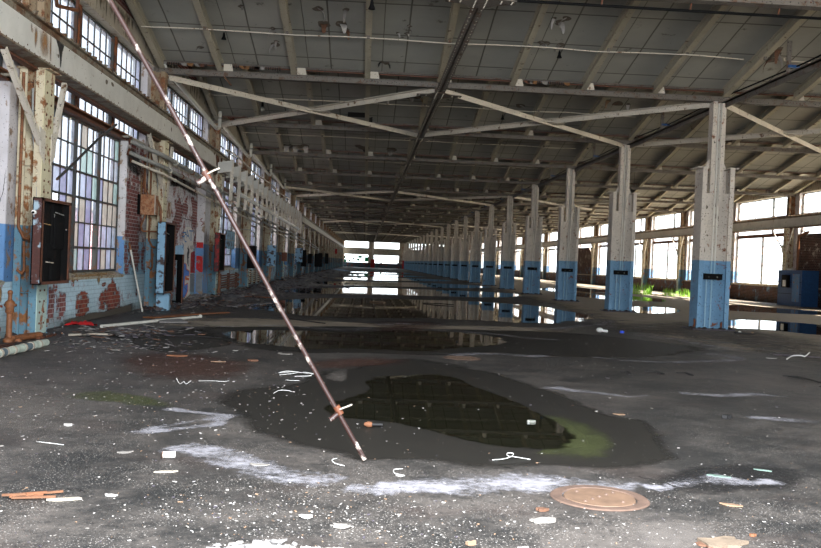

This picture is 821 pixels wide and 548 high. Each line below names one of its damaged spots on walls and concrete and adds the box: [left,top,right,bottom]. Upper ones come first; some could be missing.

peeling [126,172,141,271]
peeling [172,196,198,240]
peeling [47,287,89,320]
peeling [99,279,120,311]